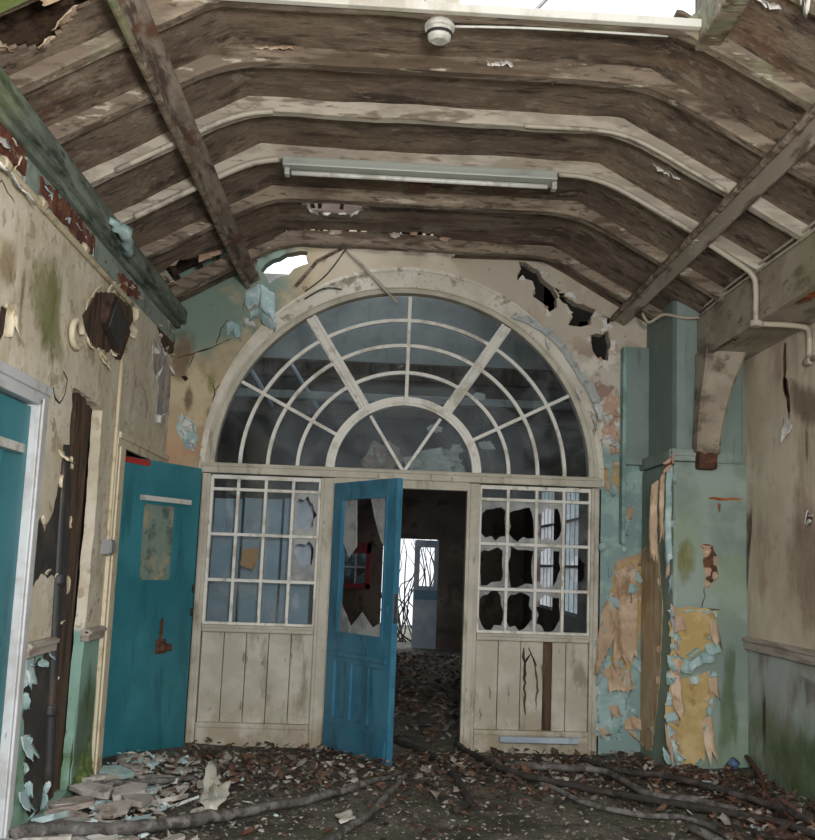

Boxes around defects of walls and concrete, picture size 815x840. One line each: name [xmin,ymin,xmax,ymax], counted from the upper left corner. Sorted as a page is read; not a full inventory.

flaking render [0,122,95,257]
spalling [68,273,143,371]
spalling [517,265,616,360]
peeling [511,313,637,497]
flaking render [590,453,723,768]
flaking render [18,652,60,823]